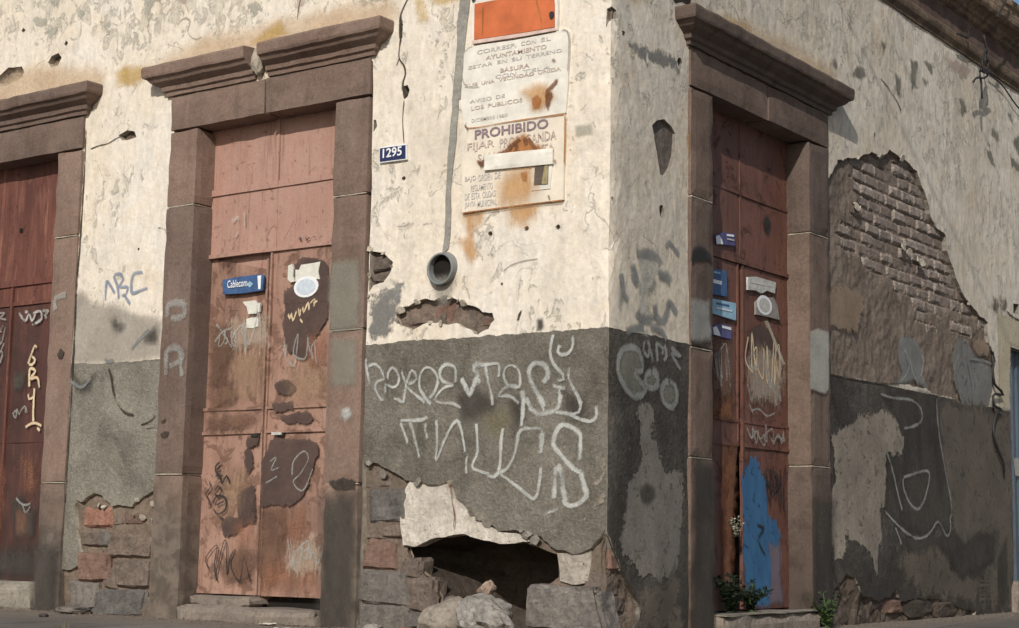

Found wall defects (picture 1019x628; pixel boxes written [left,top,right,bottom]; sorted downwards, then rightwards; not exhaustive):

spalling [2,68,24,86]
crack [396,0,409,142]
rust [524,79,558,109]
rust [501,134,556,161]
rust [503,168,536,222]
rust [464,212,481,259]
spalling [394,296,494,334]
spalling [827,151,1019,626]
spalling [329,400,685,628]
spalling [64,493,154,617]